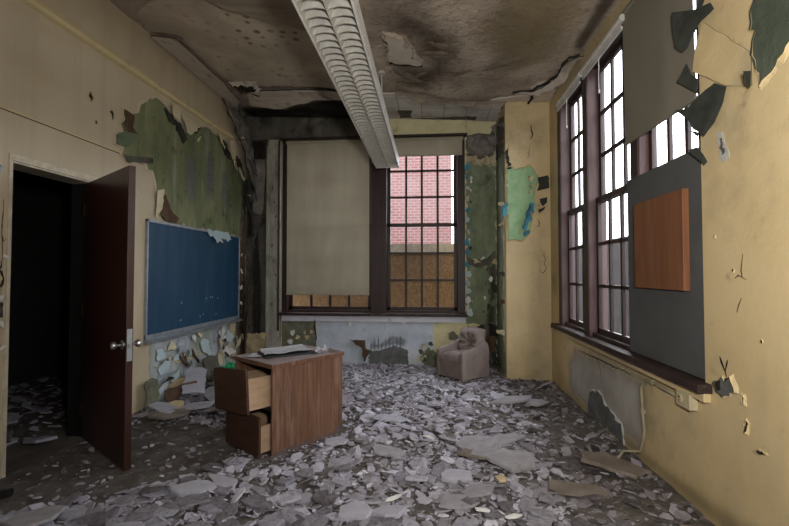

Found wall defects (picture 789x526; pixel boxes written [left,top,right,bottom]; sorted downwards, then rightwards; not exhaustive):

damp [401,18,446,87]
peeling [672,0,789,137]
peeling [688,147,707,165]
peeling [109,96,258,401]
peeling [382,80,560,375]
peeling [281,321,437,366]
flaking render [570,354,642,445]
flaking render [712,356,747,407]